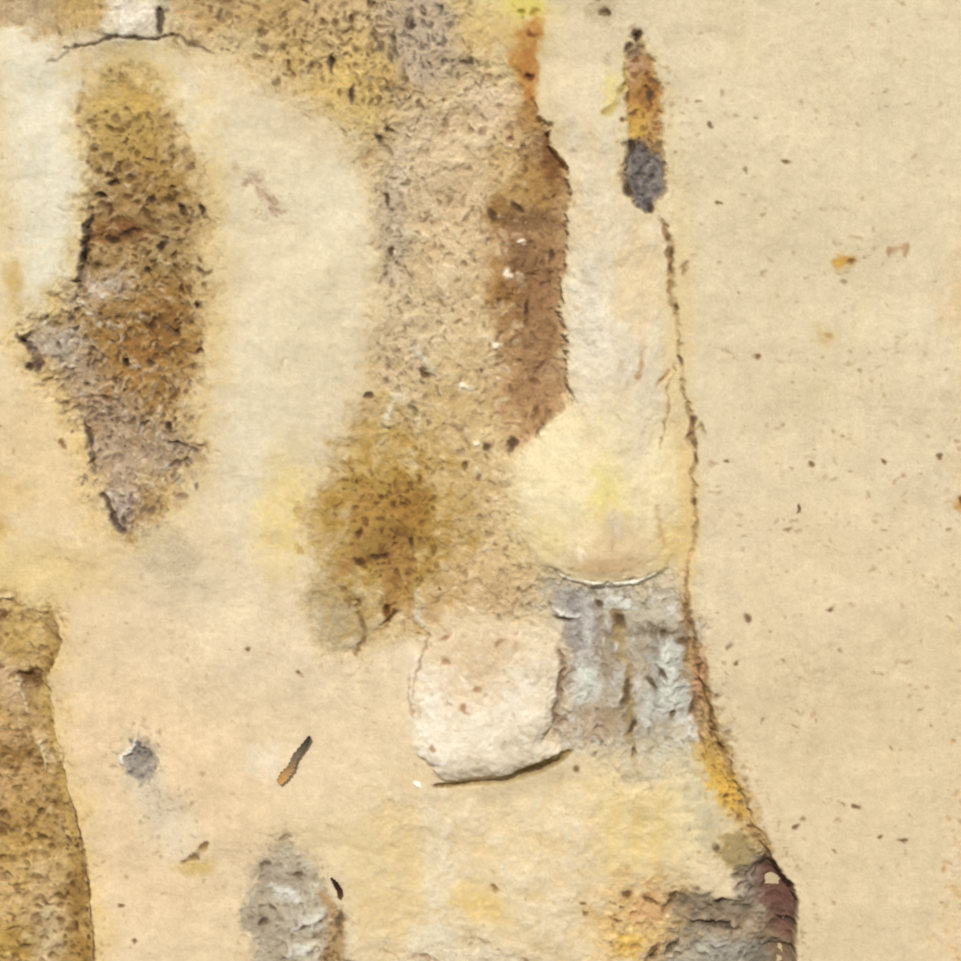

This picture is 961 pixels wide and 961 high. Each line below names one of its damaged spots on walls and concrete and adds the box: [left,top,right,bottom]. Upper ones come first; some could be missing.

crack [47,31,216,64]
flaking render [0,0,489,166]
corrosion [444,0,567,103]
flaking render [584,0,619,28]
flaking render [14,53,221,591]
flaking render [294,33,799,961]
crack [659,218,799,961]
flaking render [0,589,97,961]
peeling [120,735,160,788]
flaking render [277,736,311,785]
peeling [171,842,217,878]
peeling [240,830,355,961]